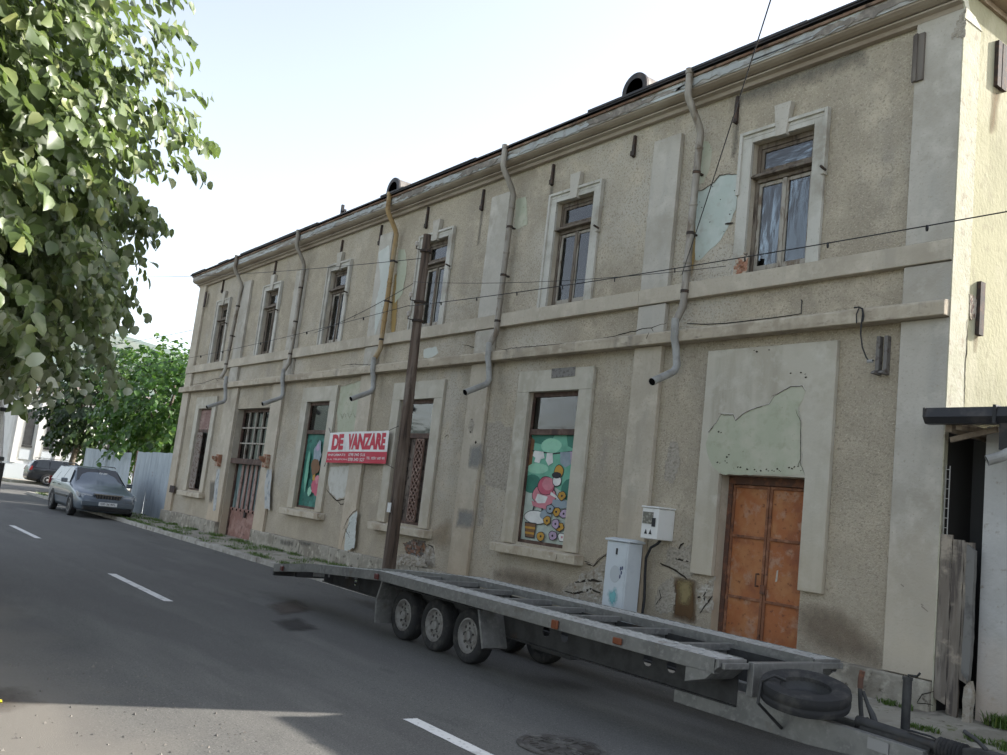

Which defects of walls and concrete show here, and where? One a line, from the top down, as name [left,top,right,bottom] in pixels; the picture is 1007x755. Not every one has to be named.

flaking render [695,141,737,261]
flaking render [706,372,807,476]
flaking render [328,466,349,500]
flaking render [561,553,607,604]
flaking render [654,543,694,615]
flaking render [696,576,716,614]